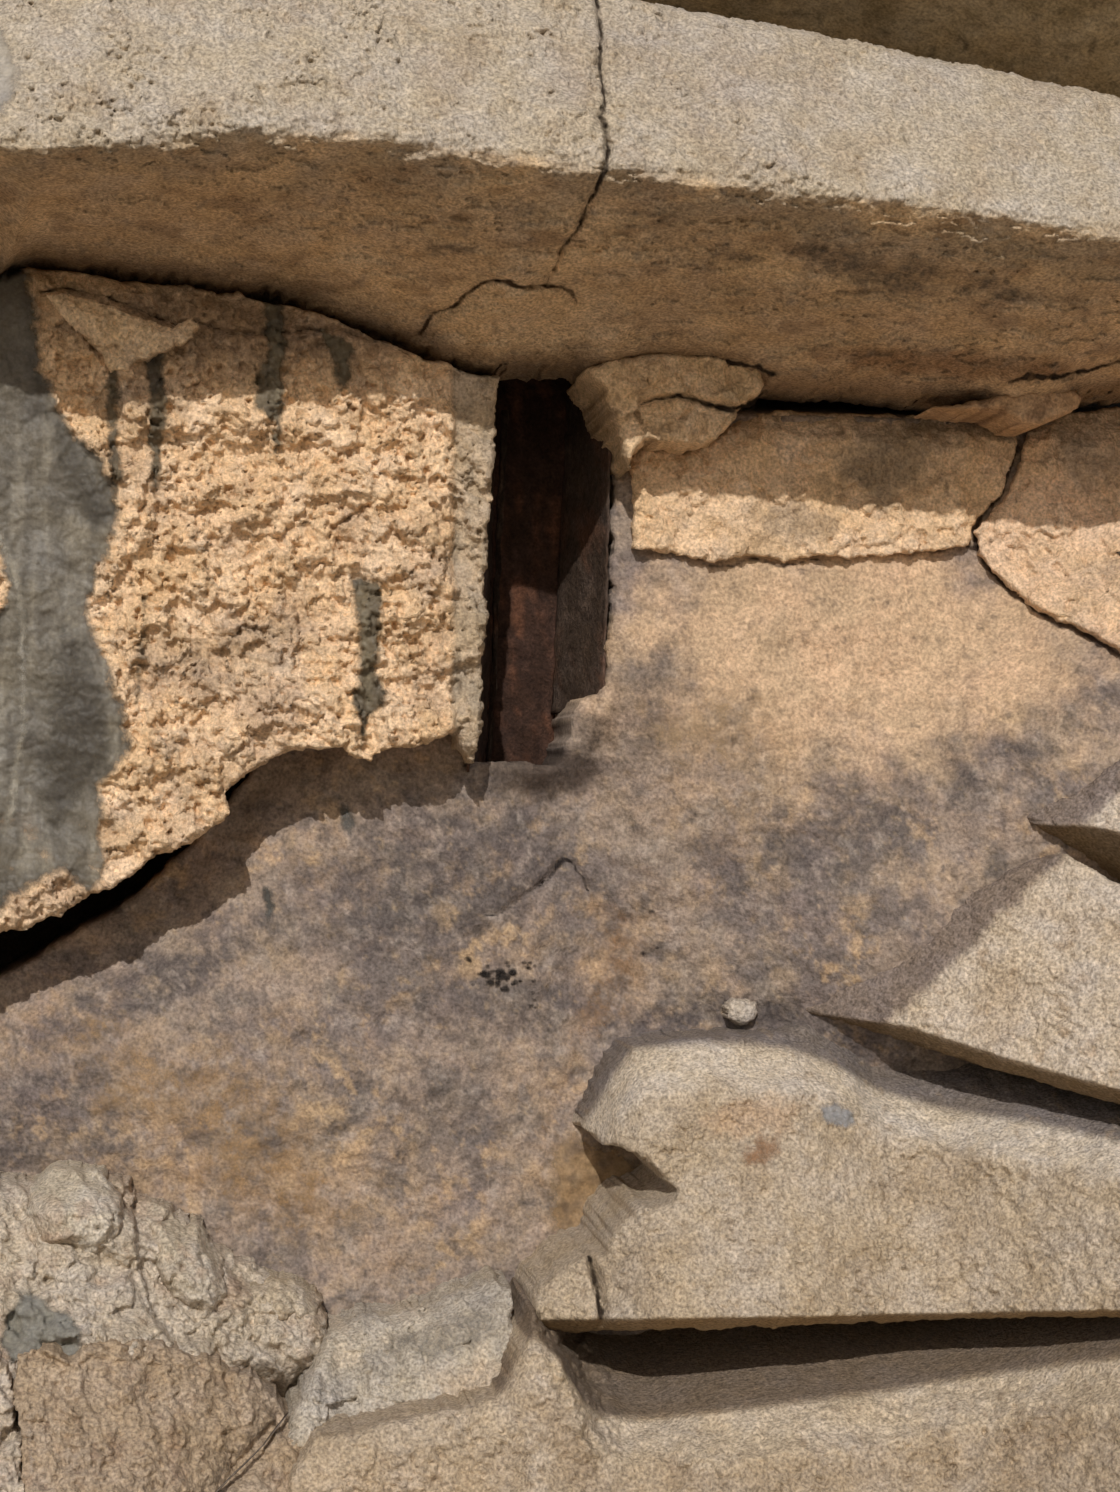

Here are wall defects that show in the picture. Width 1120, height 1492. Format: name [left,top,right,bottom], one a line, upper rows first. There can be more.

crack [566,0,610,244]
damp [146,353,168,488]
damp [255,301,288,452]
damp [320,329,353,388]
crack [399,279,574,351]
damp [0,269,131,908]
damp [352,578,387,749]
crack [711,557,819,567]
crack [966,445,1120,657]
spalling [0,1349,25,1492]